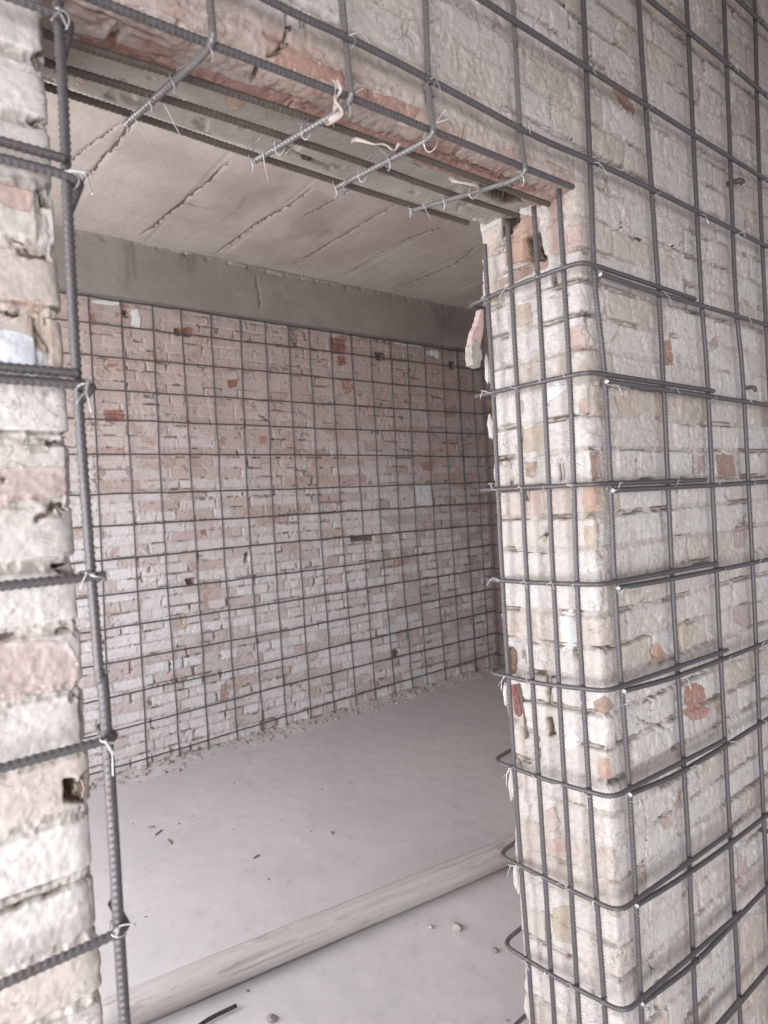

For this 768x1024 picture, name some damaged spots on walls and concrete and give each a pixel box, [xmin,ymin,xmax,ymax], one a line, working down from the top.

crack [142,163,228,234]
spalling [0,0,536,1024]
crack [218,190,350,252]
spalling [260,0,768,1024]